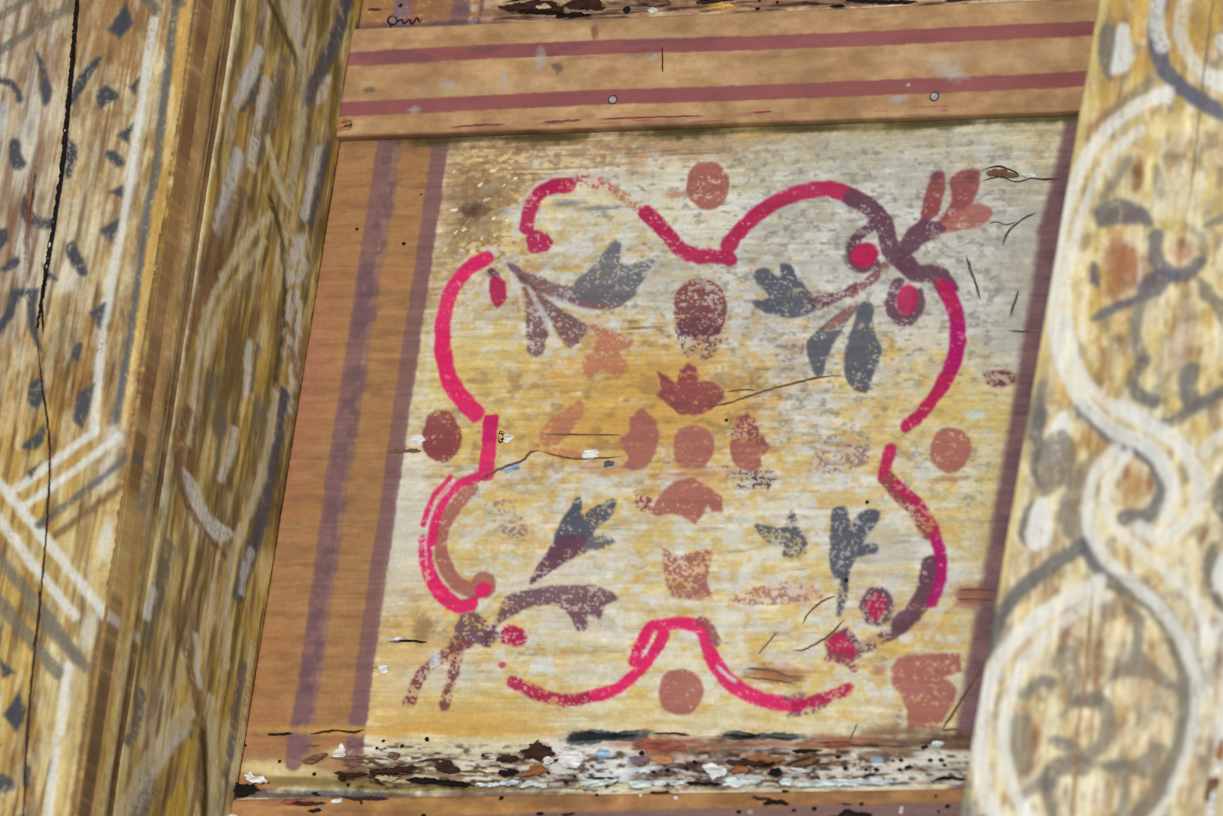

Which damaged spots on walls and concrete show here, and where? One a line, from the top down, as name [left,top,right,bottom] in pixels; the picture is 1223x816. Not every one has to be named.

spalling [497,0,605,19]
peeling [696,0,734,10]
crack [1188,0,1213,206]
peeling [983,165,1062,182]
crack [706,375,841,407]
crack [22,0,79,816]
crack [387,446,421,454]
crack [478,433,622,482]
spalling [369,751,416,782]
spalling [434,760,460,774]
flaking render [475,740,684,788]
flaking render [702,755,900,788]